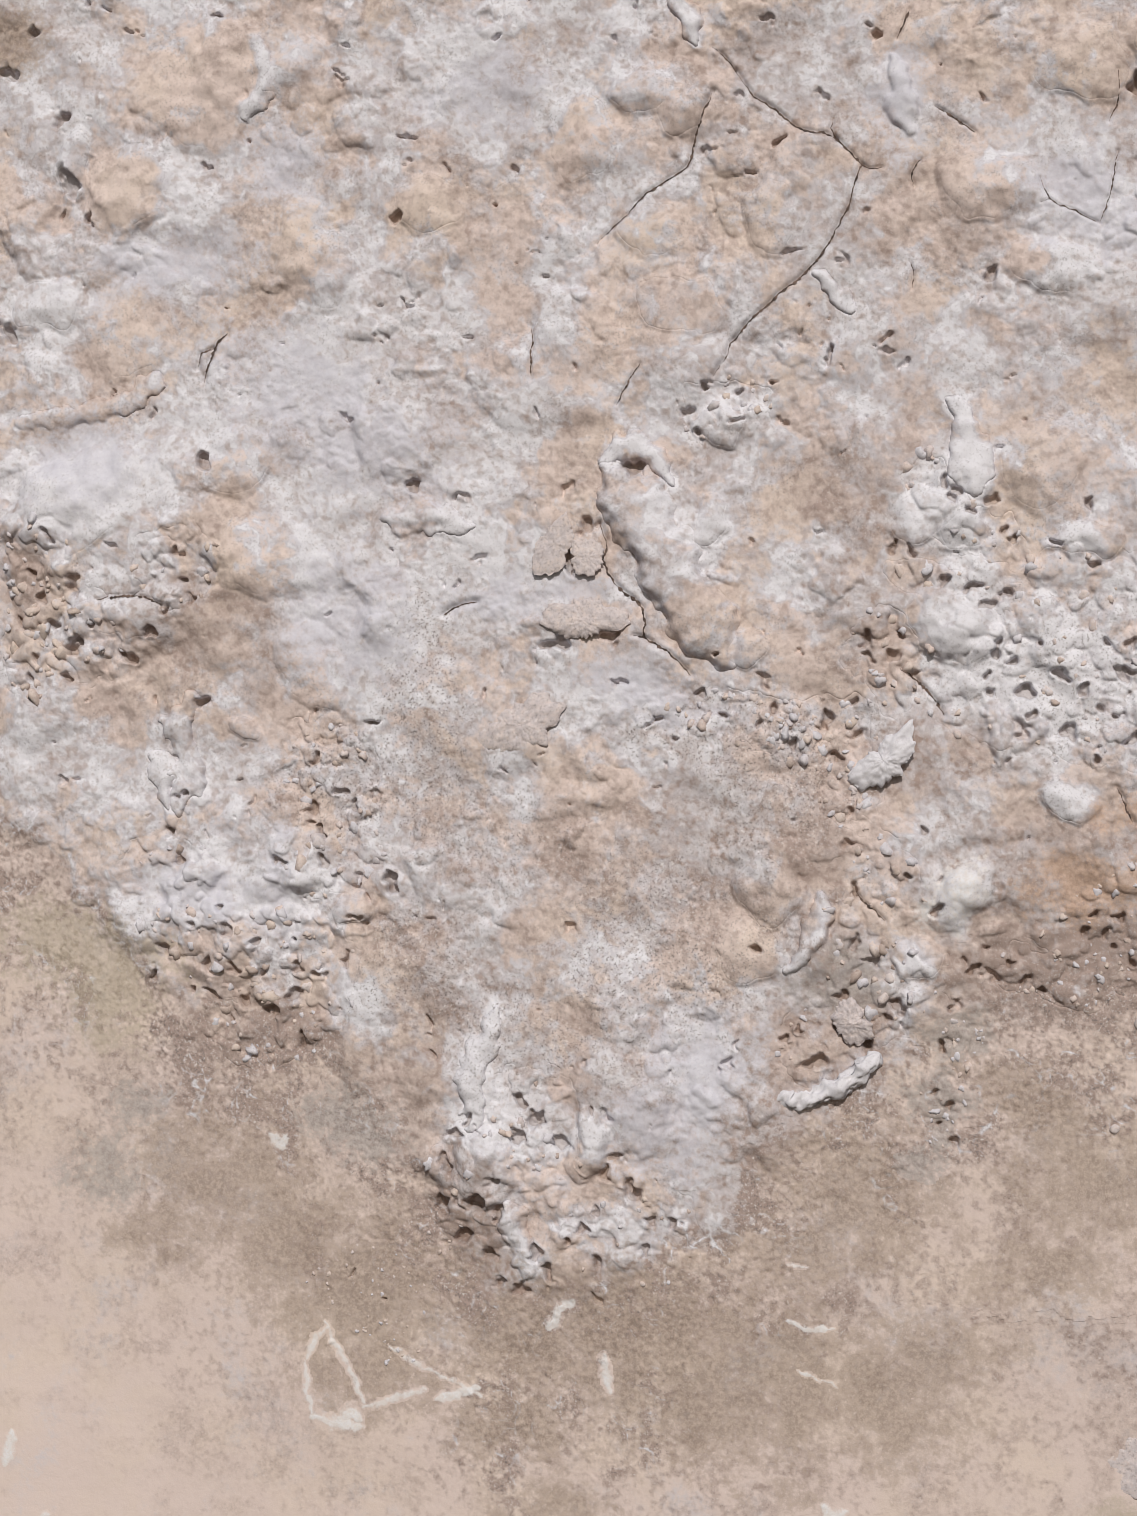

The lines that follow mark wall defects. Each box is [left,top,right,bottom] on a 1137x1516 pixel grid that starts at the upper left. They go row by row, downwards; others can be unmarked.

damp [388,19,585,148]
damp [853,22,955,179]
crack [601,49,920,376]
damp [997,114,1137,275]
crack [1041,155,1118,221]
damp [0,88,629,722]
crack [600,525,691,676]
damp [566,637,752,756]
damp [0,776,1137,1516]